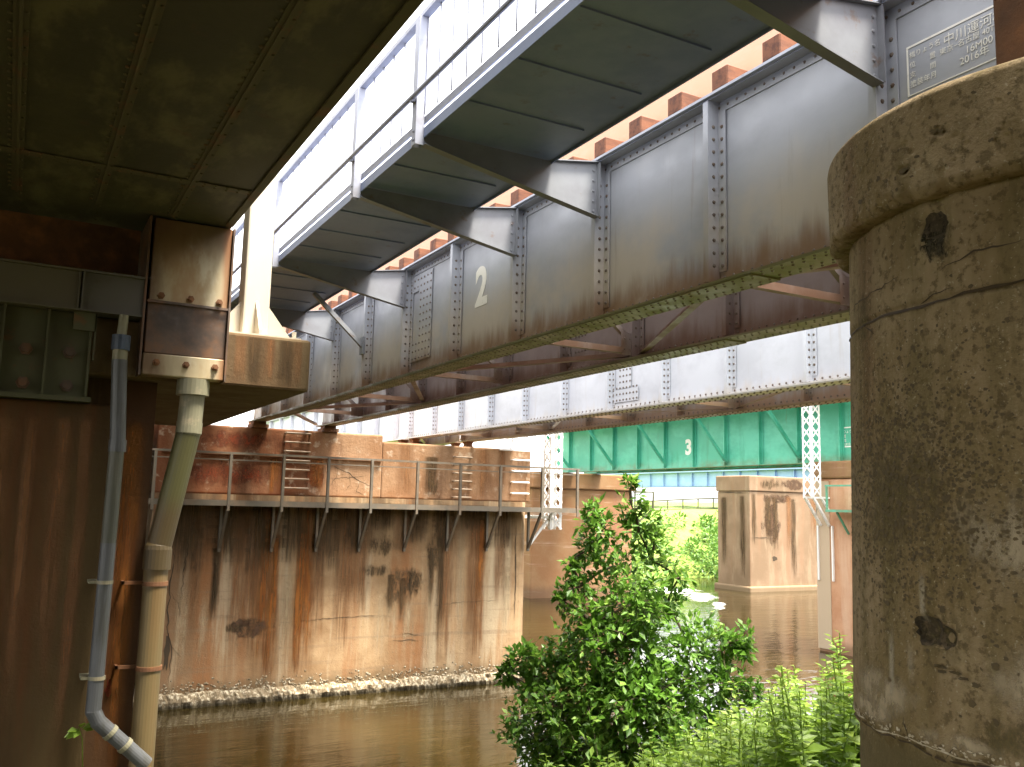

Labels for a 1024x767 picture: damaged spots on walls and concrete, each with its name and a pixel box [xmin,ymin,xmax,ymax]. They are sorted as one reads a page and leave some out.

spalling [920,211,949,260]
crack [849,240,1024,342]
corrosion [105,427,140,725]
damp [175,505,201,567]
corrosion [190,459,278,491]
damp [200,506,270,638]
corrosion [231,509,280,663]
corrosion [293,509,324,662]
crack [329,467,374,494]
damp [282,503,510,644]
damp [741,480,802,573]
spalling [850,320,1024,717]